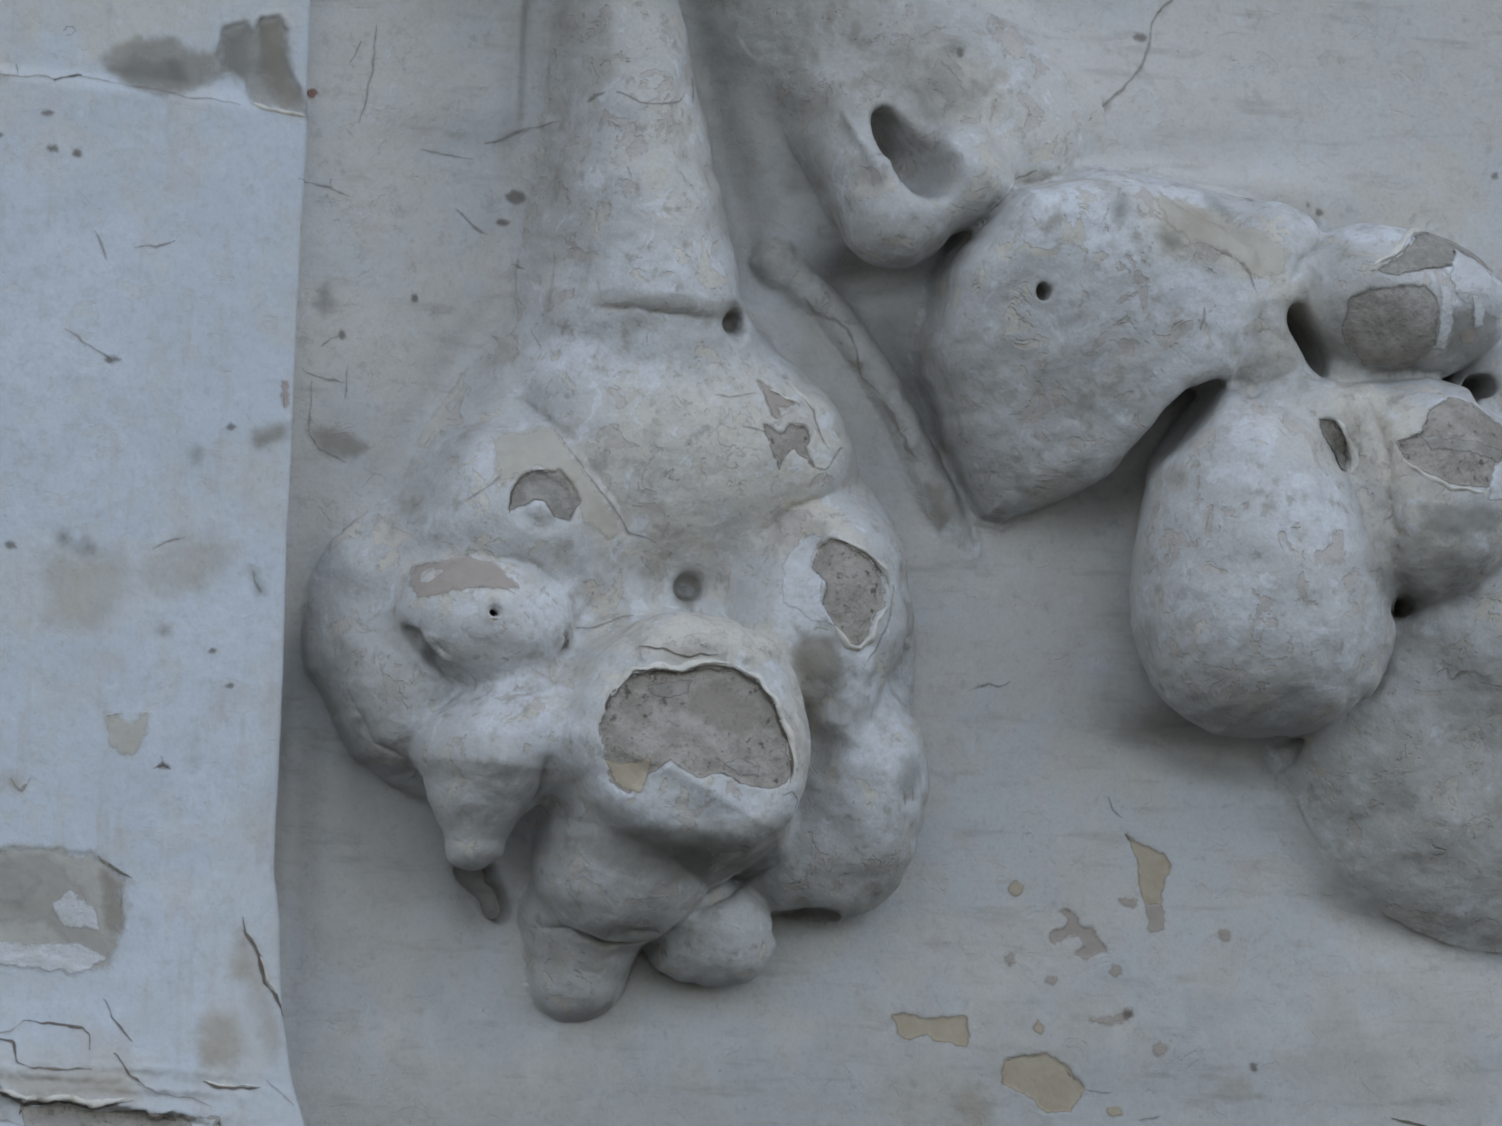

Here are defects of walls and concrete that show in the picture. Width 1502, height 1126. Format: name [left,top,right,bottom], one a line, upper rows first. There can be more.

peeling [1342,228,1502,369]
peeling [476,427,640,539]
peeling [749,377,843,470]
peeling [1396,397,1502,500]
peeling [409,556,519,596]
peeling [783,535,891,654]
peeling [598,646,798,793]
peeling [0,846,131,974]
peeling [1119,834,1171,932]
crack [243,920,283,1015]
peeling [892,1013,969,1046]
peeling [1001,1053,1123,1116]